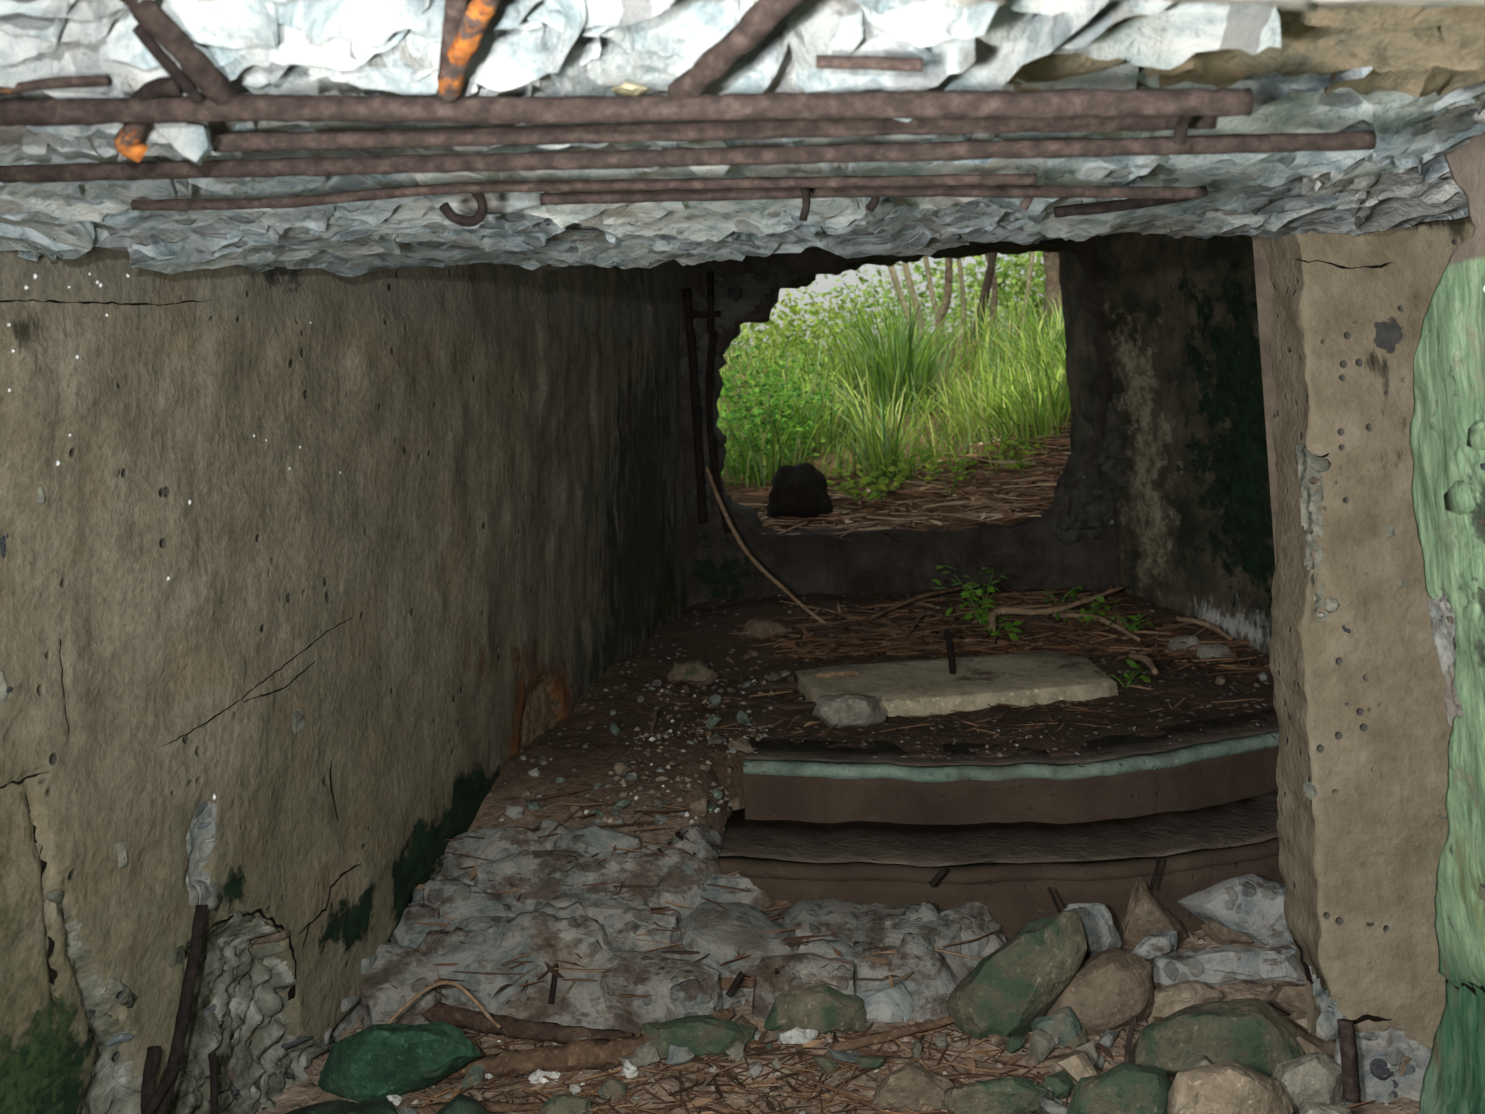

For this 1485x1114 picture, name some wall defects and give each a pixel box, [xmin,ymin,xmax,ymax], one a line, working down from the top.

corrosion [0,0,1377,218]
crack [0,298,209,306]
spalling [0,0,1485,515]
water stain [1469,475,1485,544]
crack [59,639,70,740]
crack [163,618,353,746]
water stain [1458,579,1485,667]
crack [0,772,58,999]
spalling [44,889,142,1114]
spalling [160,800,361,1114]
crack [1446,979,1485,996]